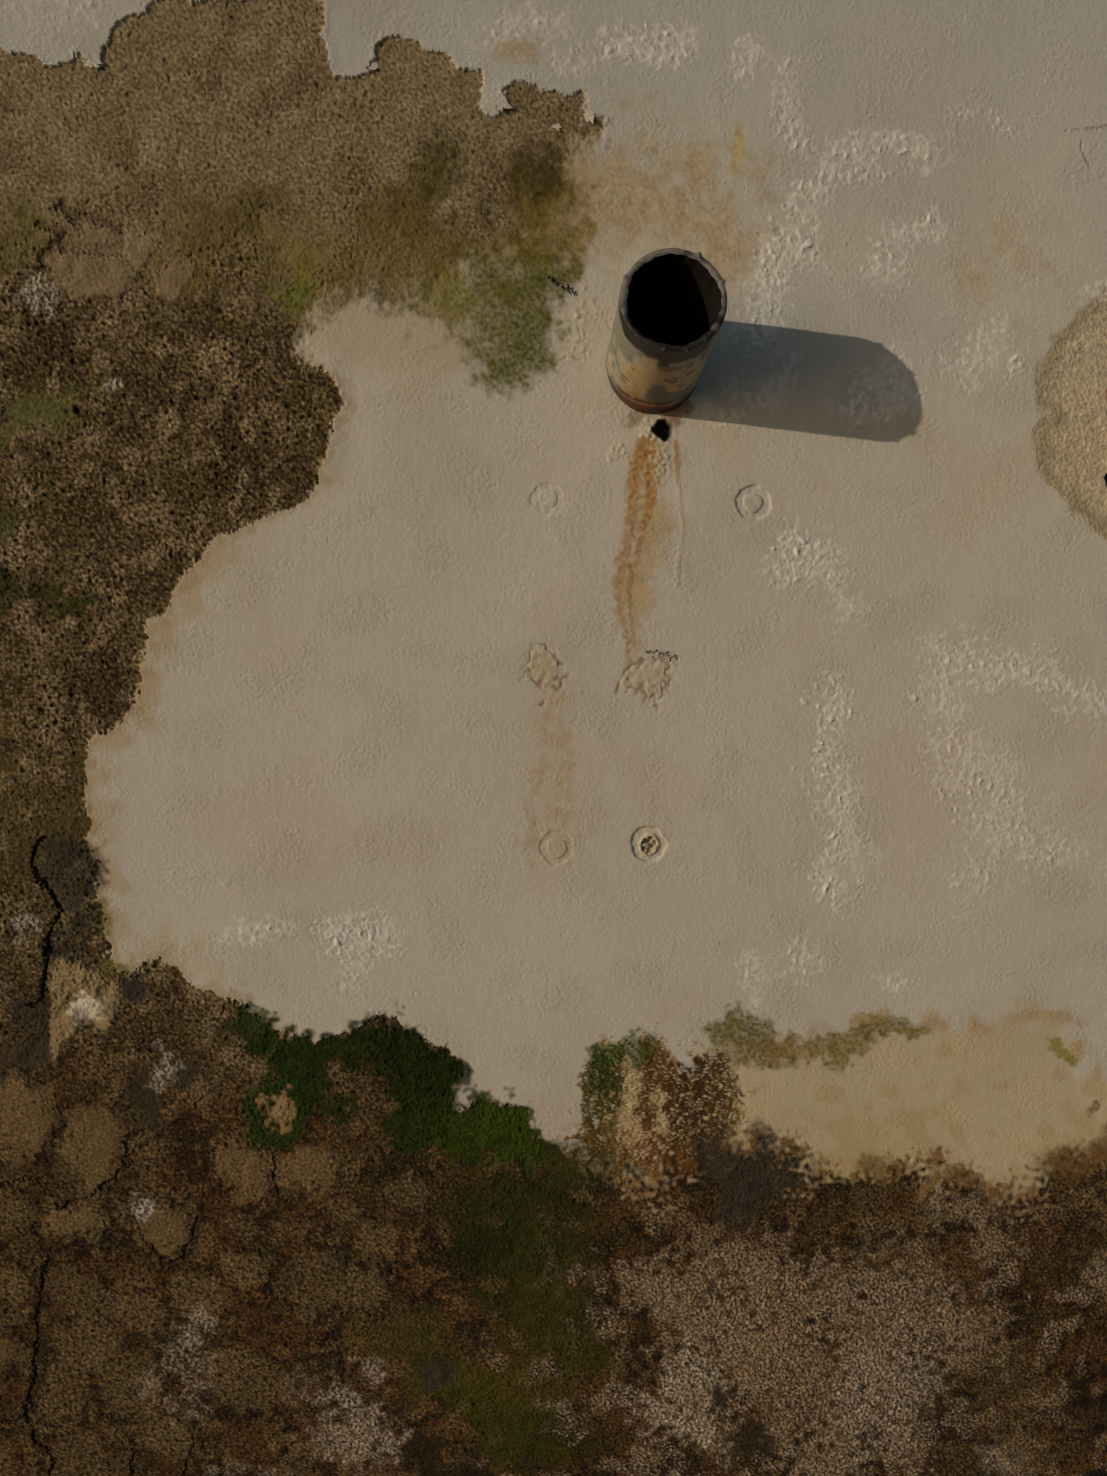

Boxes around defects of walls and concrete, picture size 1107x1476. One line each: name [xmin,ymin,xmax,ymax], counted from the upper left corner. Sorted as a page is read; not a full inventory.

peeling [0,0,605,806]
rust [612,399,695,657]
water stain [461,0,1014,431]
water stain [816,182,1107,435]
peeling [1033,288,1107,541]
crack [0,1251,60,1476]
crack [0,1139,133,1211]
crack [141,1209,200,1265]
peeling [0,834,1107,1476]
water stain [563,1005,1107,1233]